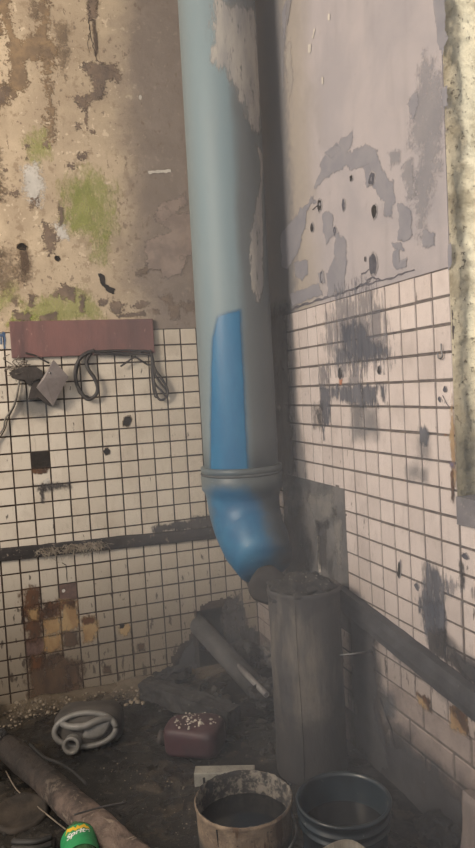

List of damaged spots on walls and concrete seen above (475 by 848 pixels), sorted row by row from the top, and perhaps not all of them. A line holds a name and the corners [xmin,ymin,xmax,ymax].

spalling [433,0,448,56]
peeling [280,59,448,306]
damp [0,250,32,290]
damp [336,316,390,365]
damp [313,383,387,427]
peeling [31,451,50,484]
corrosion [18,585,98,653]
damp [419,599,475,685]